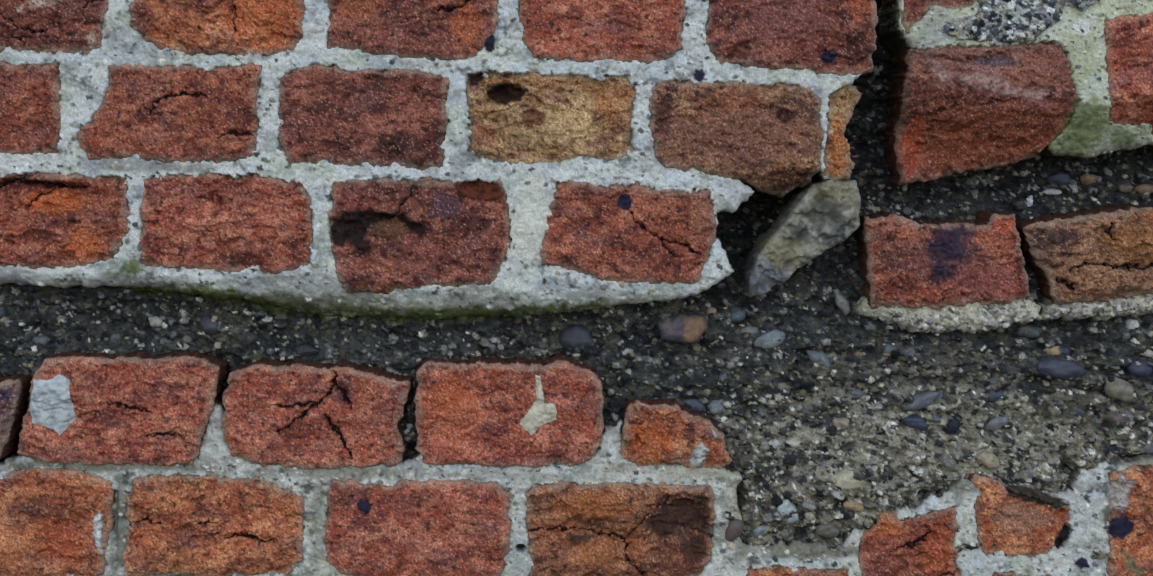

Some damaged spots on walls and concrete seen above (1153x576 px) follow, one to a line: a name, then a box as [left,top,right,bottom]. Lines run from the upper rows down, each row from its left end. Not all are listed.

crack [631,211,703,257]
crack [275,371,353,458]
spalling [1002,480,1068,509]
spalling [569,535,593,545]
spalling [651,496,710,564]